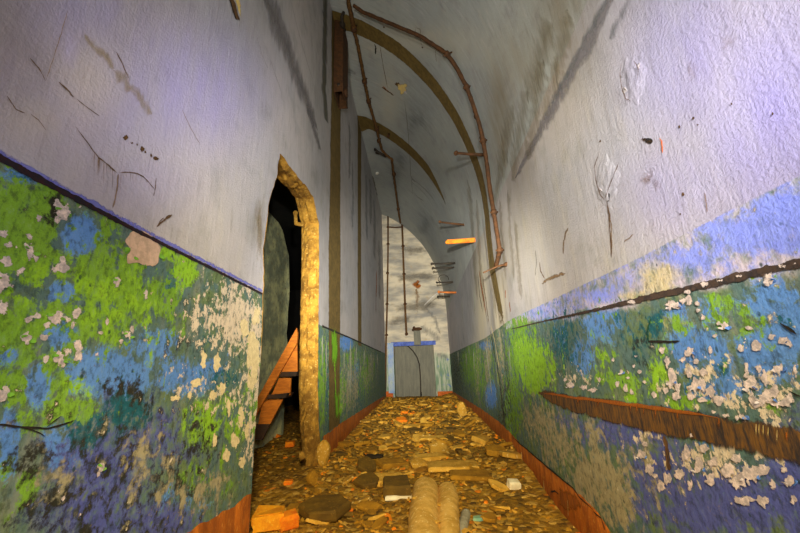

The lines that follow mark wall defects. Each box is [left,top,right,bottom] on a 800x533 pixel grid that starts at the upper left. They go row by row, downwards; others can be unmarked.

crack [30,11,99,116]
crack [78,130,156,196]
peeling [0,230,41,315]
peeling [125,231,165,269]
peeling [240,216,268,390]
spalling [268,154,320,467]
peeling [665,289,705,320]
peeling [170,350,221,401]
peeling [209,382,256,469]
peeling [646,319,750,421]
peeling [742,363,798,408]
peeling [636,433,798,509]